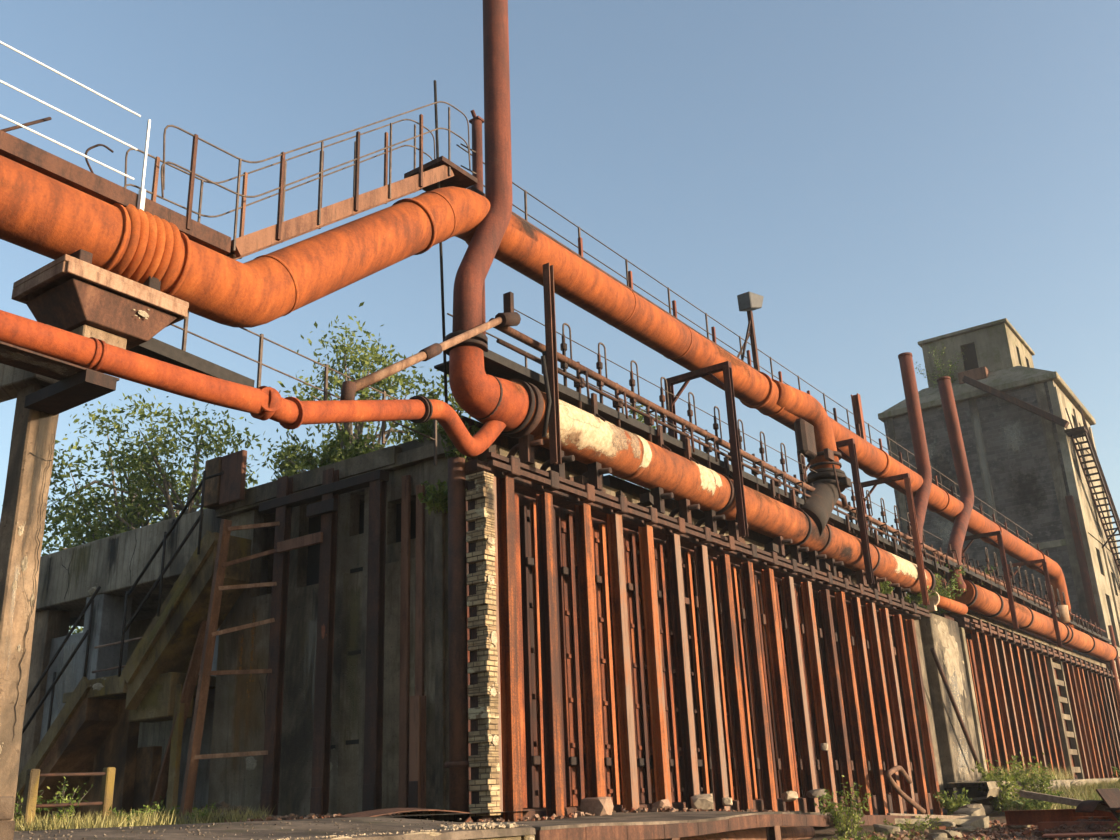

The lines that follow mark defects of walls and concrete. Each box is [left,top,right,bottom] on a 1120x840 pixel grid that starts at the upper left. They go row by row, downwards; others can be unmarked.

peeling [548,399,652,468]
peeling [693,461,723,495]